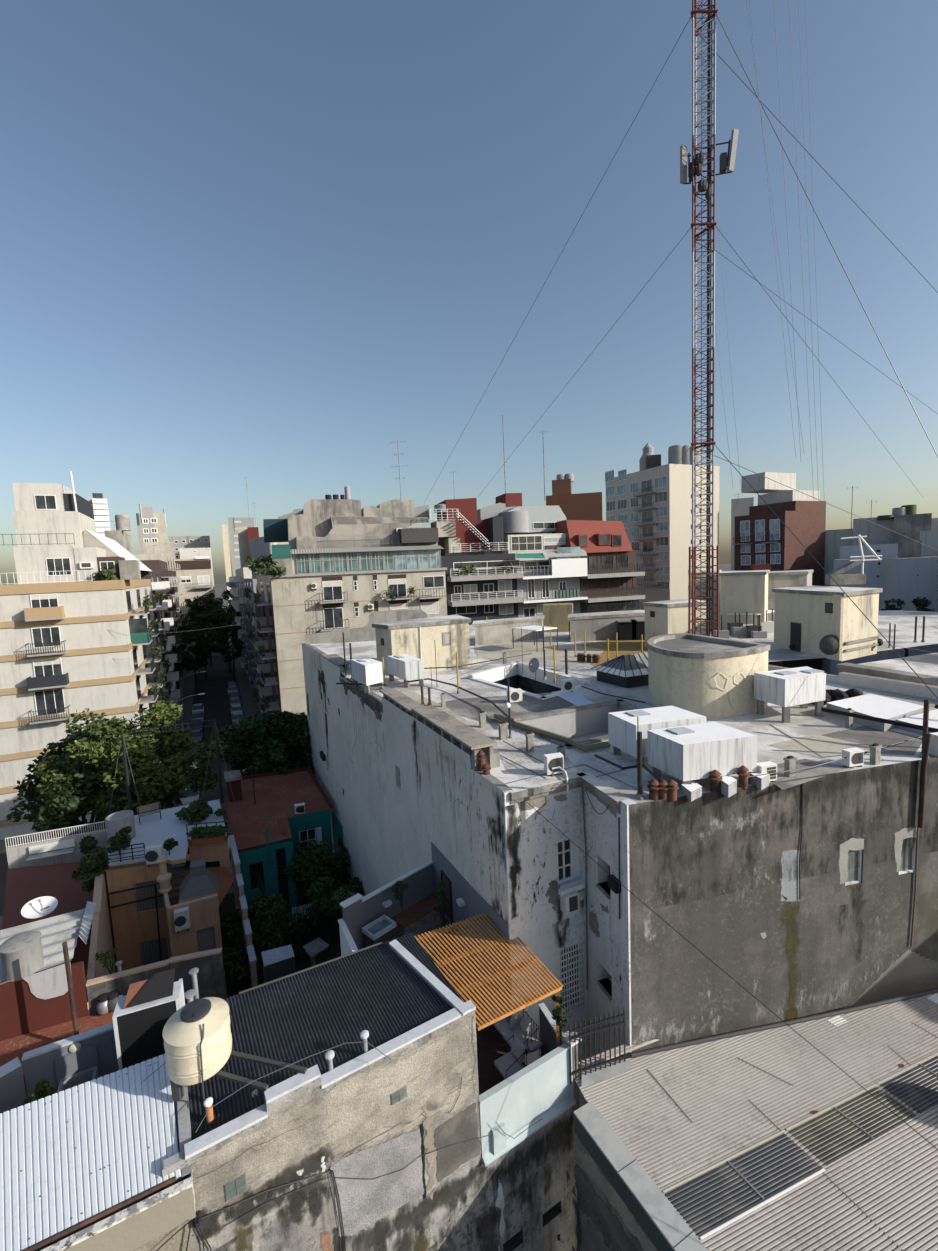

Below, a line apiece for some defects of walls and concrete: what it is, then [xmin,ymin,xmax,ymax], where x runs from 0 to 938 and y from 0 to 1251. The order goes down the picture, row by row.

water stain [307,670,329,753]
peeling [518,794,567,815]
water stain [459,767,570,947]
spalling [545,879,561,911]
peeling [589,903,609,938]
water stain [196,1150,332,1251]
water stain [349,1115,636,1251]
peeling [574,1145,657,1251]